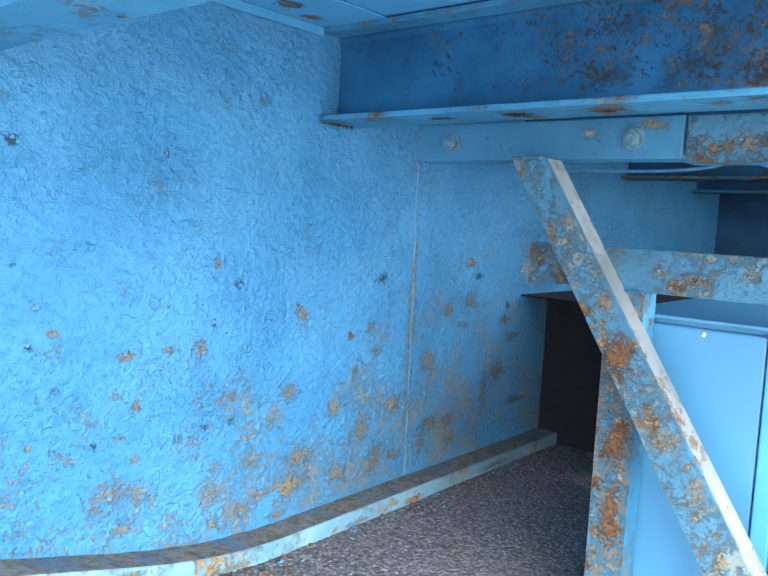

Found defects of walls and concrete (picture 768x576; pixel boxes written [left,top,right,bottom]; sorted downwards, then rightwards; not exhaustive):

corrosion [291,302,312,330]
corrosion [377,227,437,417]
corrosion [593,290,616,319]
corrosion [603,329,642,384]
corrosion [282,383,297,403]
corrosion [323,391,346,423]
corrosion [348,412,453,472]
corrosion [83,477,152,517]
corrosion [195,463,223,531]
corrosion [234,443,315,520]
corrosion [591,414,630,551]
corrosion [682,475,706,516]